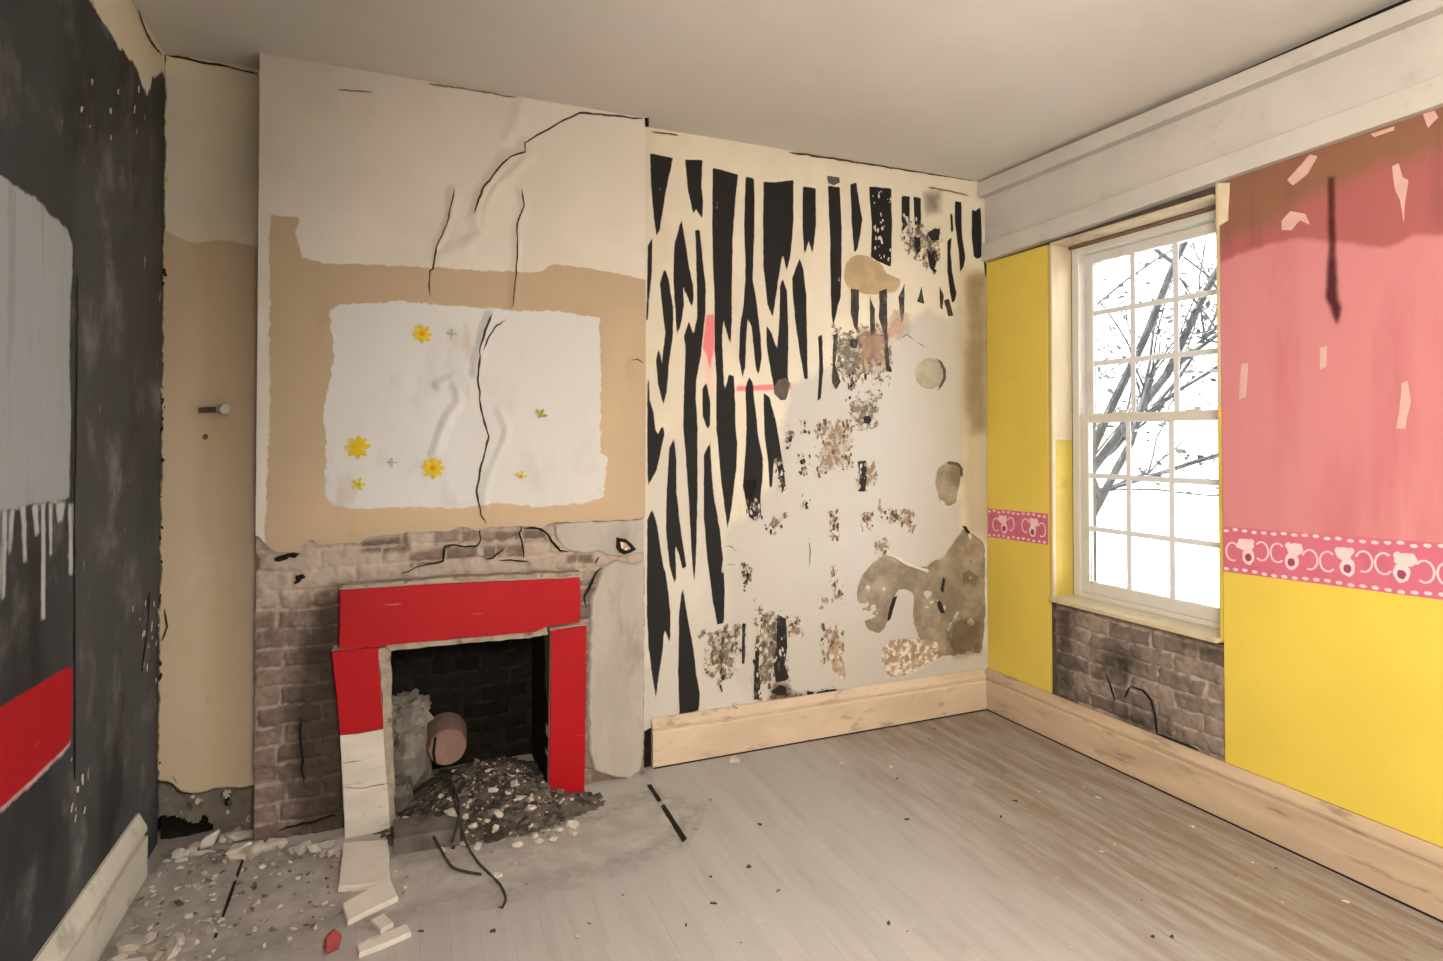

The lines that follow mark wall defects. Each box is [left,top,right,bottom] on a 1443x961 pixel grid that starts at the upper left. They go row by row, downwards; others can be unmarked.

crack [789,152,972,196]
crack [401,112,678,608]
spalling [698,191,986,709]
flaking render [254,522,645,842]
flaking render [1053,603,1225,762]
spalling [161,795,213,839]
peeling [220,789,232,815]